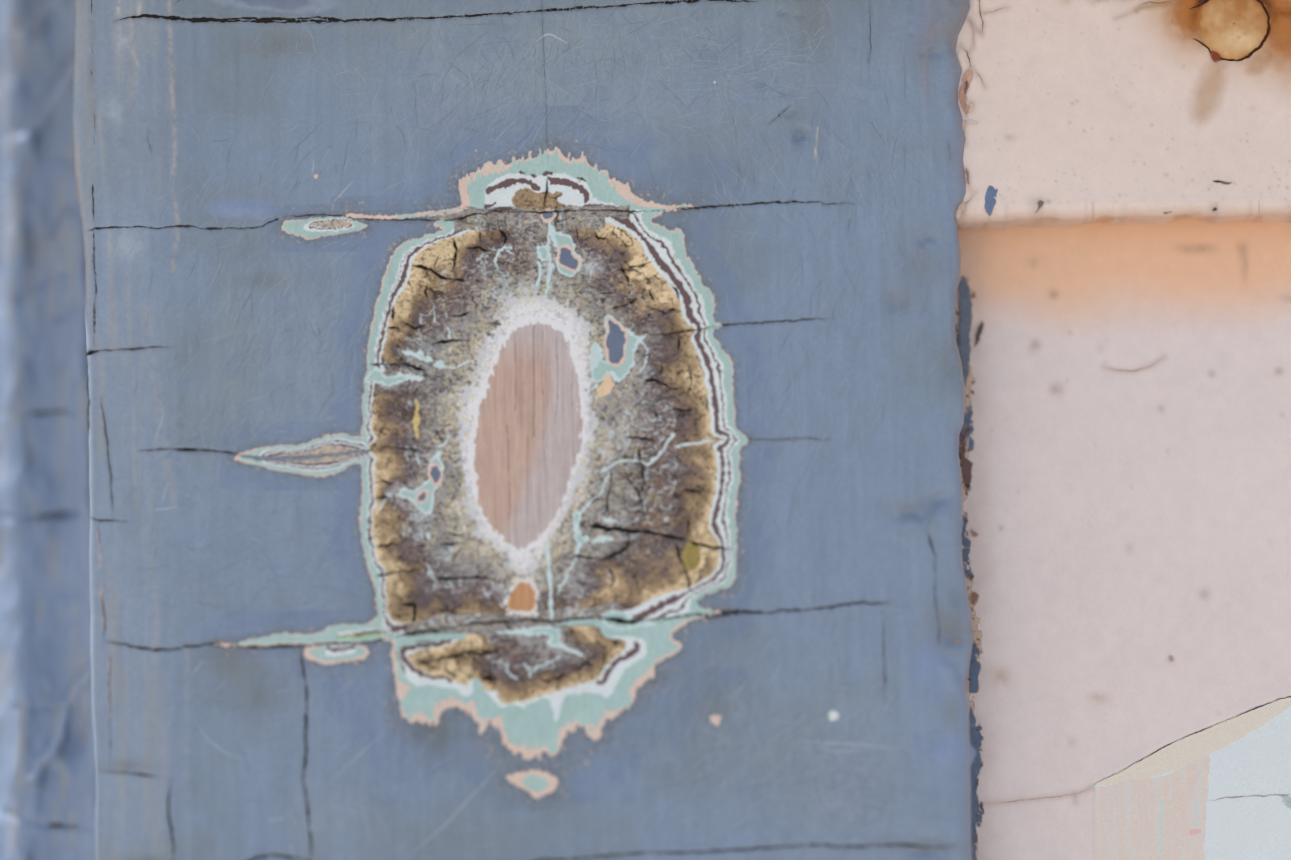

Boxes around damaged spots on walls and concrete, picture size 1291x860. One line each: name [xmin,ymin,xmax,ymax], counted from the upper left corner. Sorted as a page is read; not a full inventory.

corrosion [1169,0,1221,62]
corrosion [1261,0,1291,62]
crack [31,0,951,860]
peeling [1093,696,1291,860]